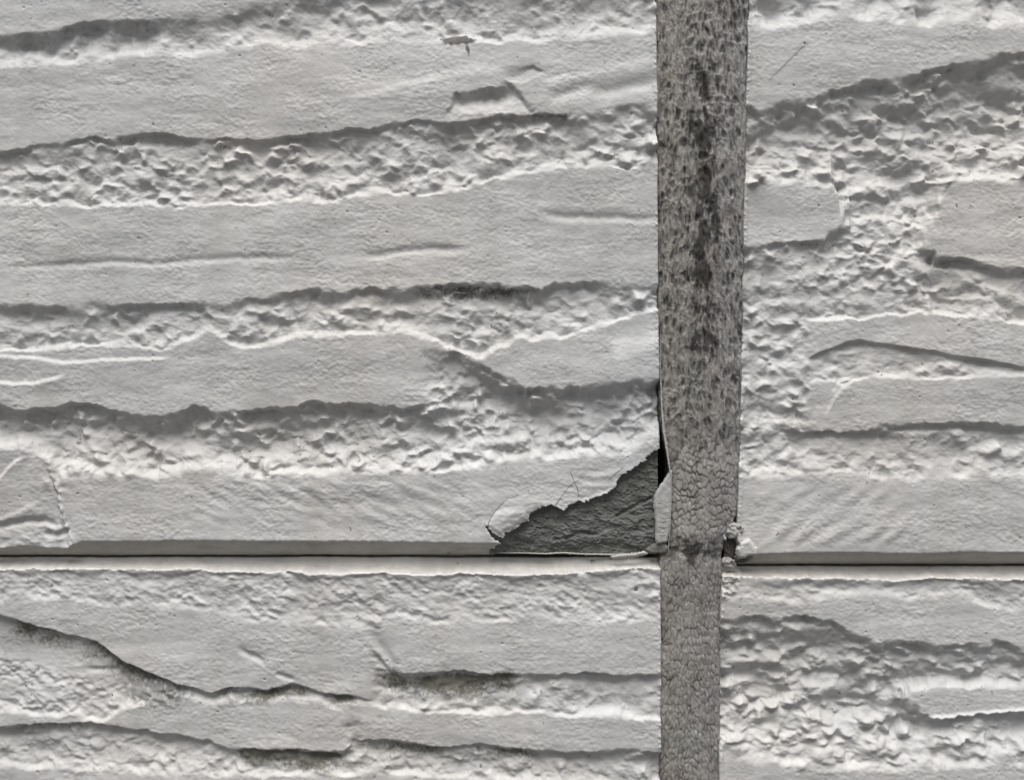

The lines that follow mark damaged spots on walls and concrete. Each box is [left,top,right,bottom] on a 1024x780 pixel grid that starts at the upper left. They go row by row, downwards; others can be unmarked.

spalling [486,451,672,562]